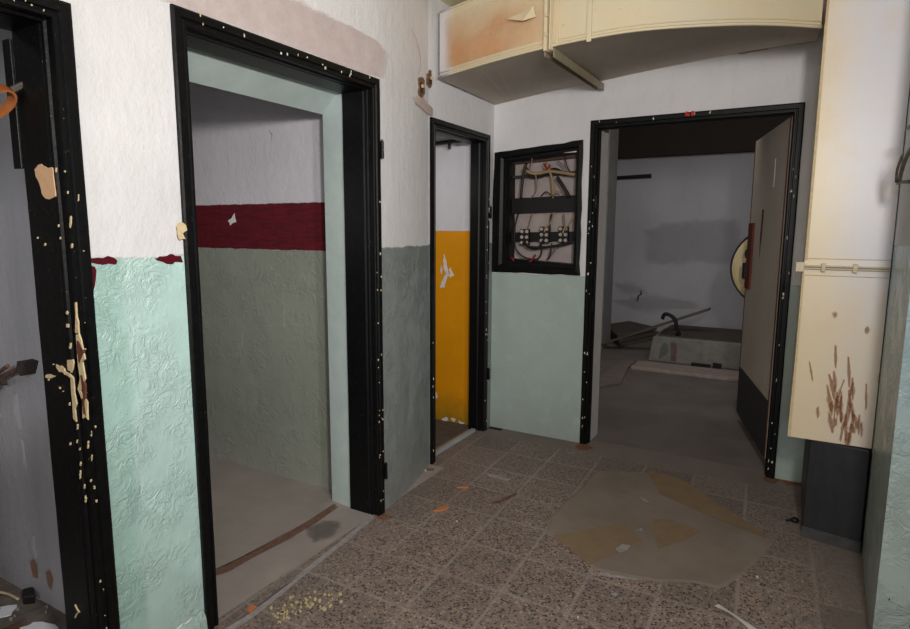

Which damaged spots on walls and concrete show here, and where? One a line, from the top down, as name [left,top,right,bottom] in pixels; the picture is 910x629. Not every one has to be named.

peeling [34,164,66,199]
peeling [45,302,98,503]
corrosion [817,347,867,446]